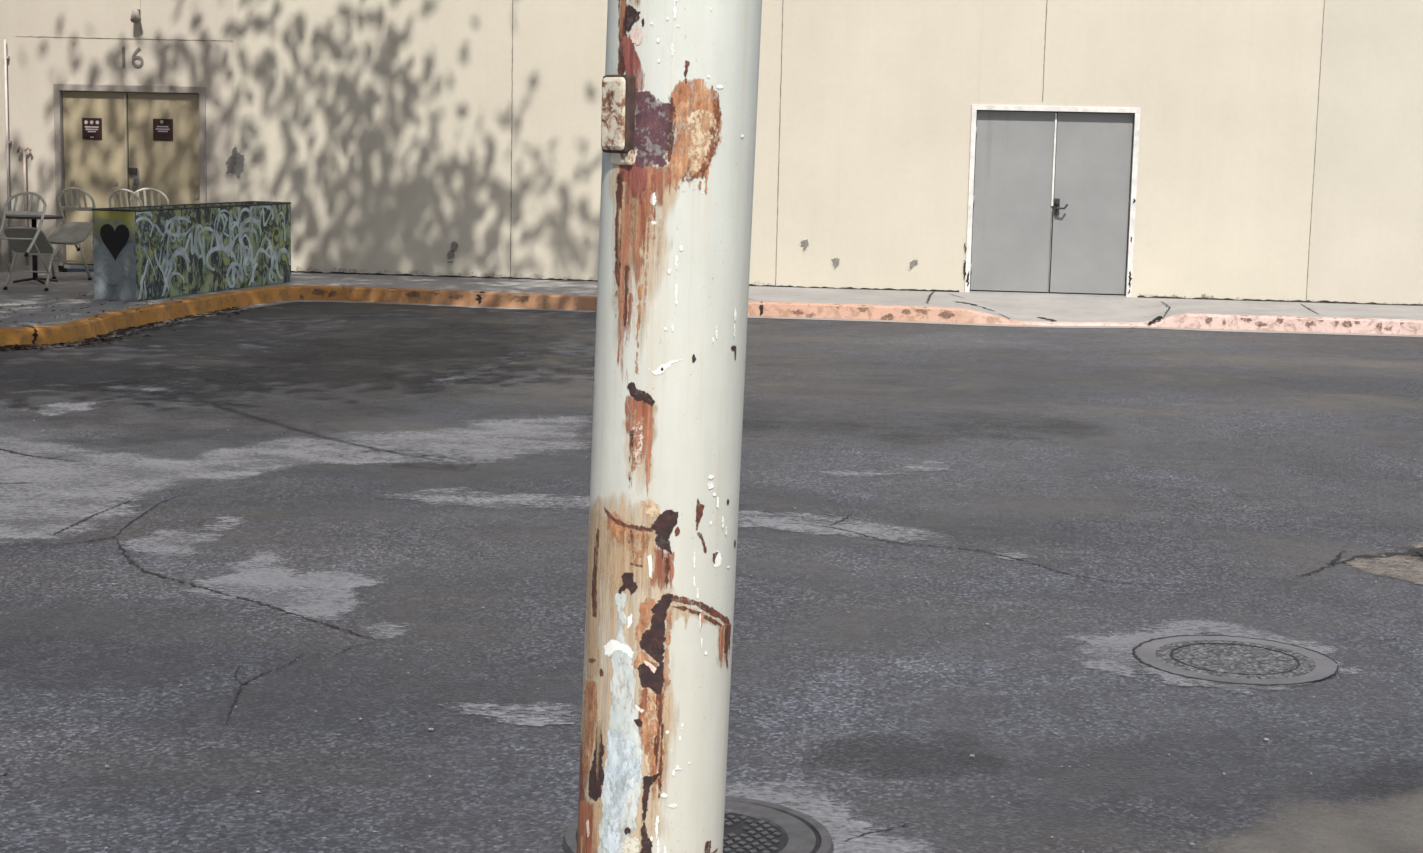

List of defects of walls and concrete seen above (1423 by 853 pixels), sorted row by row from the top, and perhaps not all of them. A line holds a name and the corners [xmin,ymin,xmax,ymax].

spalling [1206,315,1404,331]
rust [576,0,722,853]
crack [0,448,82,484]
peeling [708,474,727,535]
crack [50,494,381,655]
peeling [693,550,730,655]
crack [1291,547,1423,578]
crack [225,655,302,724]
peeling [578,499,690,853]